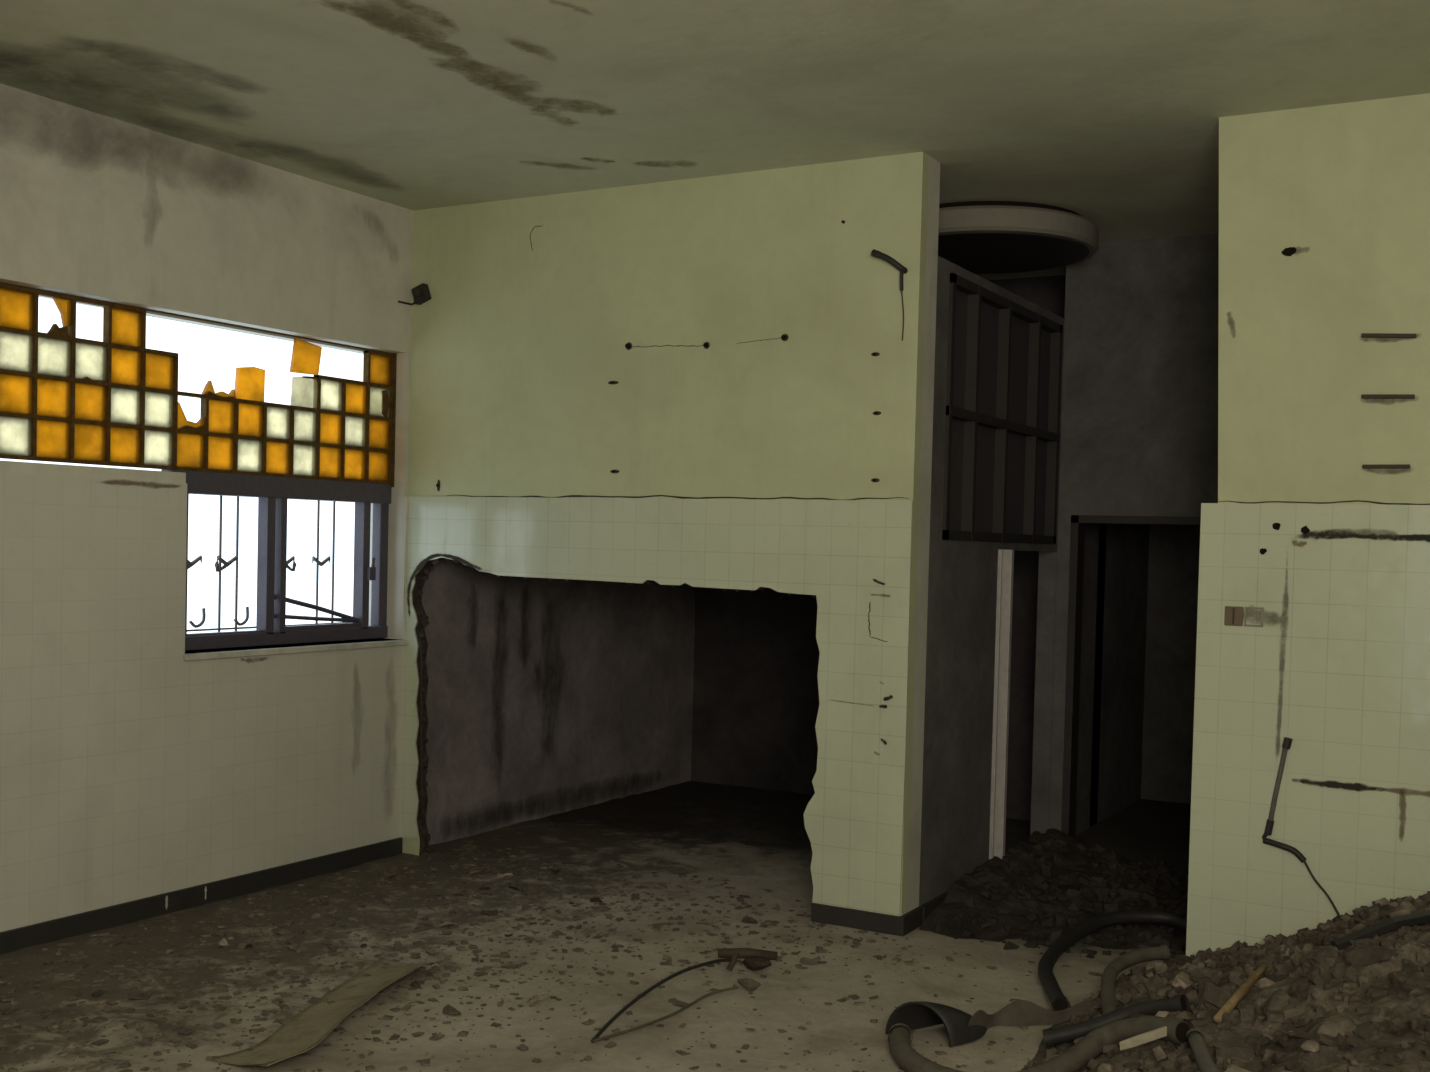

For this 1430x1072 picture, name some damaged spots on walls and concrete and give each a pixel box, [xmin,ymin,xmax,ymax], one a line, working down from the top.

spalling [407,554,528,852]